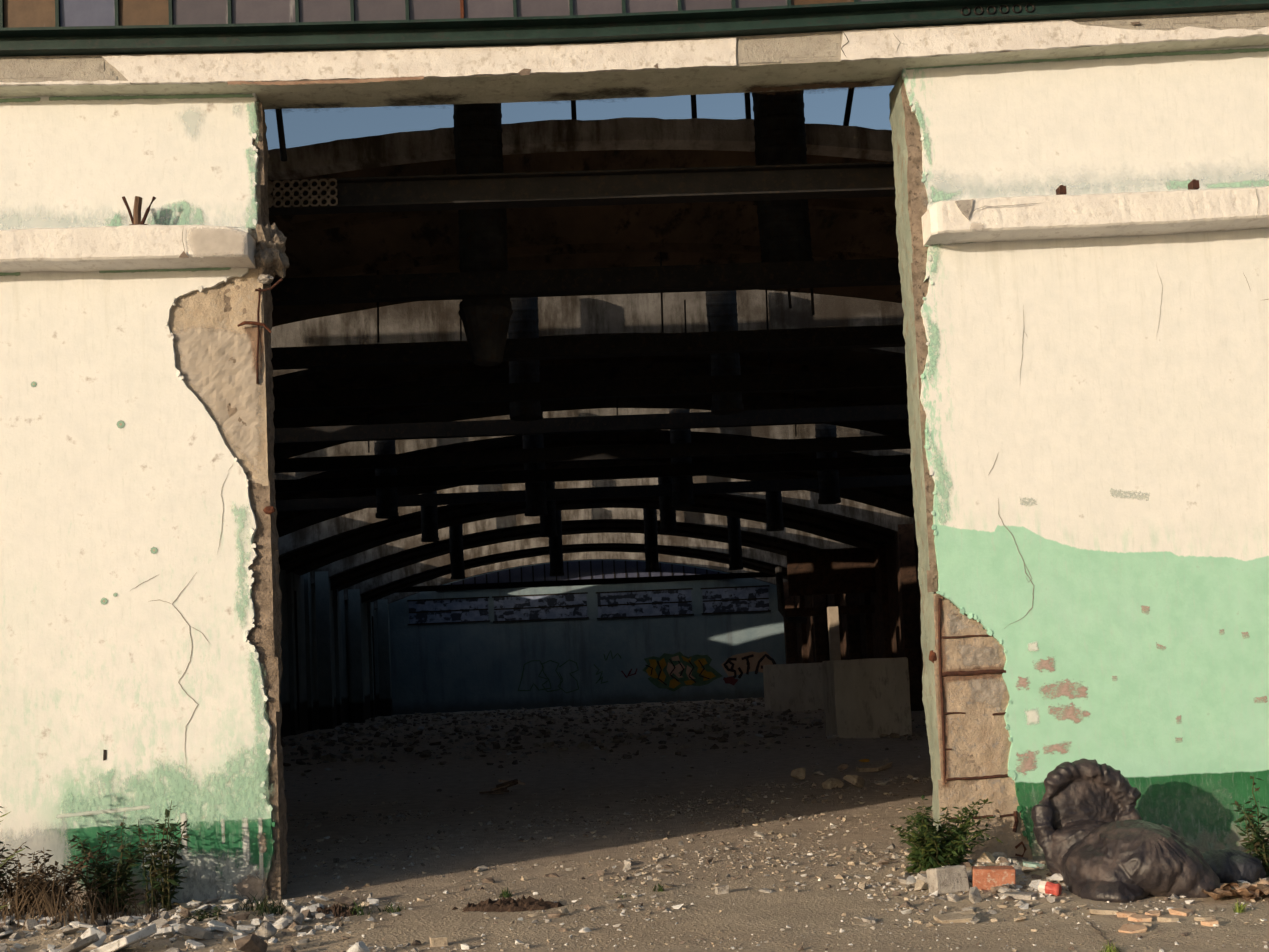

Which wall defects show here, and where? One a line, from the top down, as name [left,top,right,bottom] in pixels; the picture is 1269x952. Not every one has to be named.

crack [130,572,208,774]
spalling [62,251,283,901]
crack [989,452,1034,629]
spalling [902,48,1269,860]